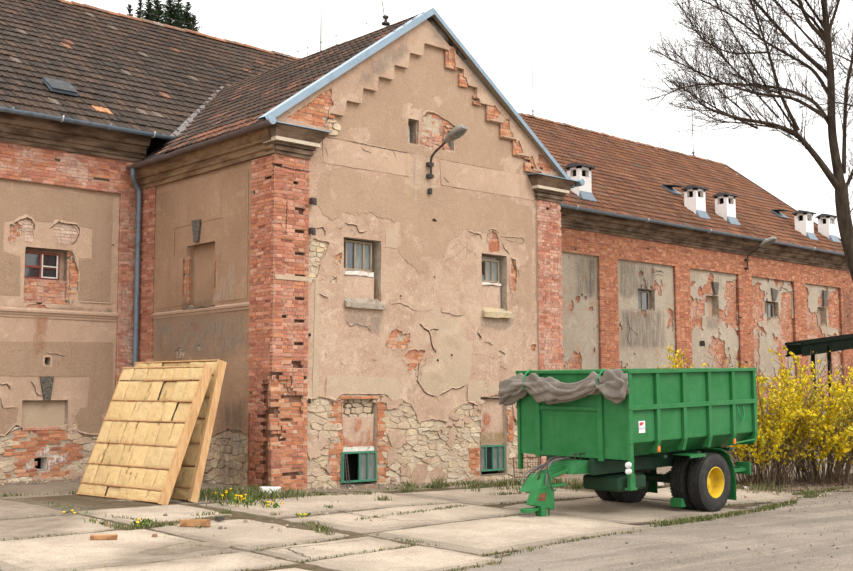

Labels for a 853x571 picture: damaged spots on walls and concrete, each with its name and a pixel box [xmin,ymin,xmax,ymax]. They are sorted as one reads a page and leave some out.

spalling [415,112,455,150]
spalling [8,218,34,243]
spalling [300,239,328,284]
spalling [826,290,840,329]
spalling [386,329,425,371]
crack [394,301,478,406]